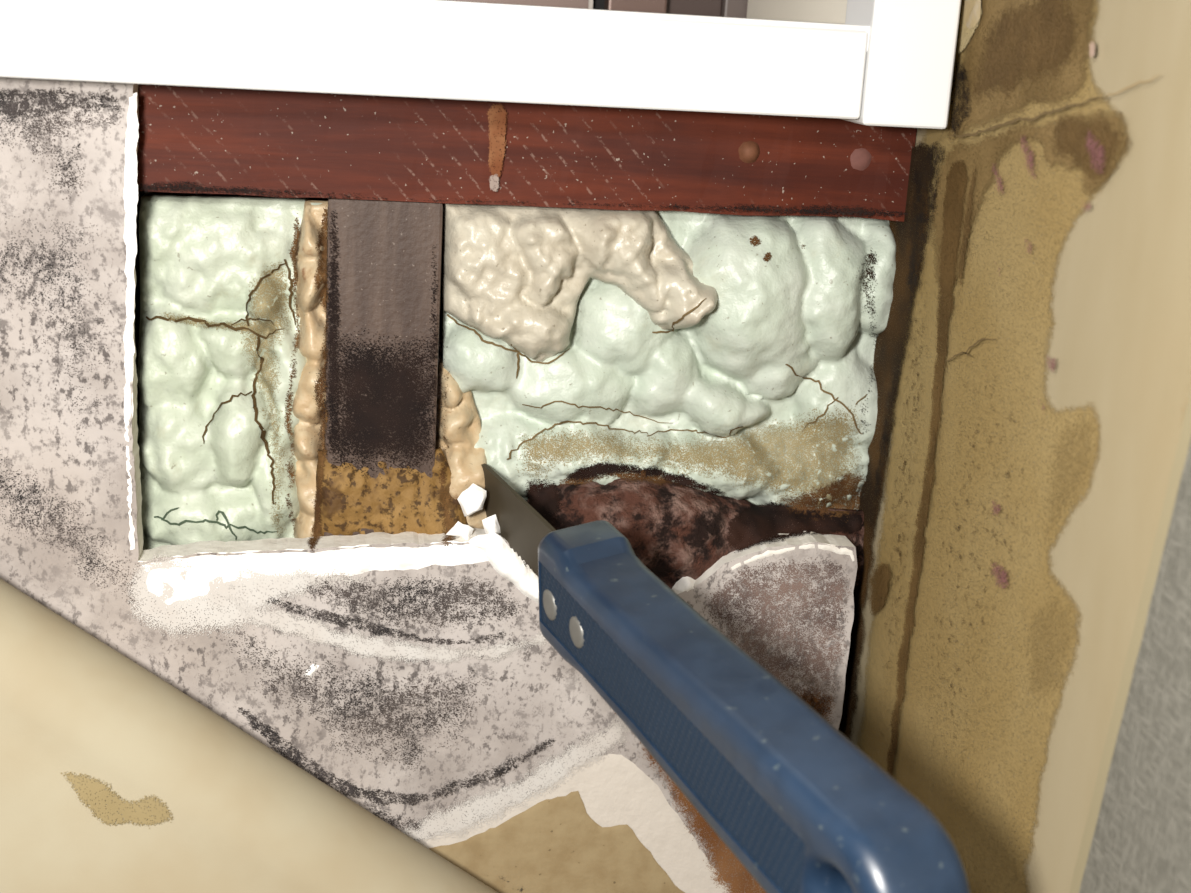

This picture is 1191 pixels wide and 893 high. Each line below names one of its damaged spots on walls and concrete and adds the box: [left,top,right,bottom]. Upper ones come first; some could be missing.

mould [0,87,124,200]
crack [952,74,1160,138]
mould [0,209,114,440]
leakage [516,0,1132,893]
mould [0,454,156,604]
mould [265,575,526,645]
mould [216,629,494,771]
mould [238,707,556,834]